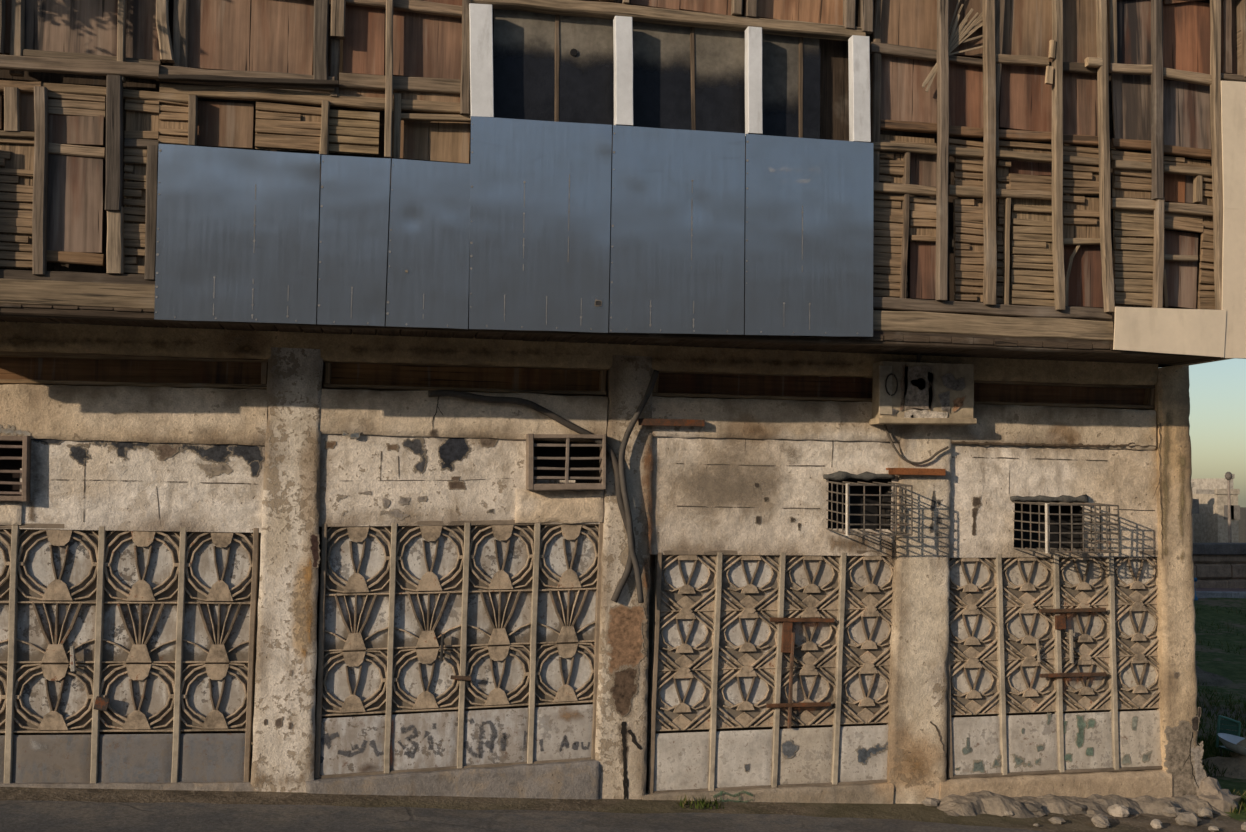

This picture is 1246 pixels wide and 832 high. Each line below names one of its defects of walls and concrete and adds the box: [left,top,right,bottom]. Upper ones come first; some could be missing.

peeling [0,422,265,478]
peeling [386,437,498,490]
spalling [605,604,648,717]
peeling [955,737,1044,773]
peeling [1047,713,1096,763]
spalling [1121,707,1207,797]